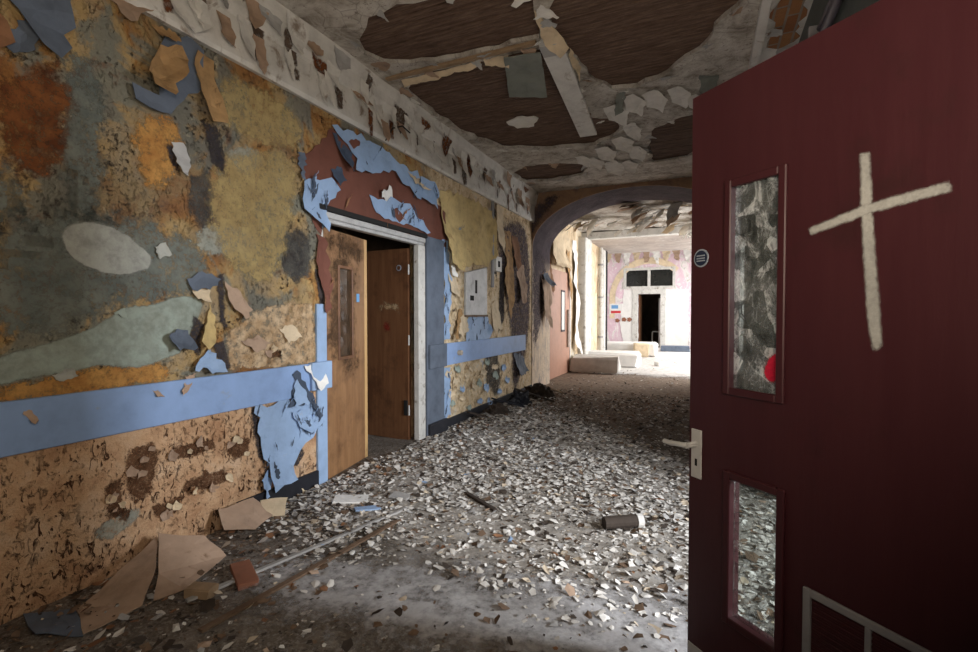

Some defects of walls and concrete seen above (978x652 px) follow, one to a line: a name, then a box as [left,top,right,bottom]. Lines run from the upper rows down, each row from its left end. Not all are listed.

flaking render [766,0,808,55]
flaking render [104,0,743,522]
peeling [0,362,170,424]